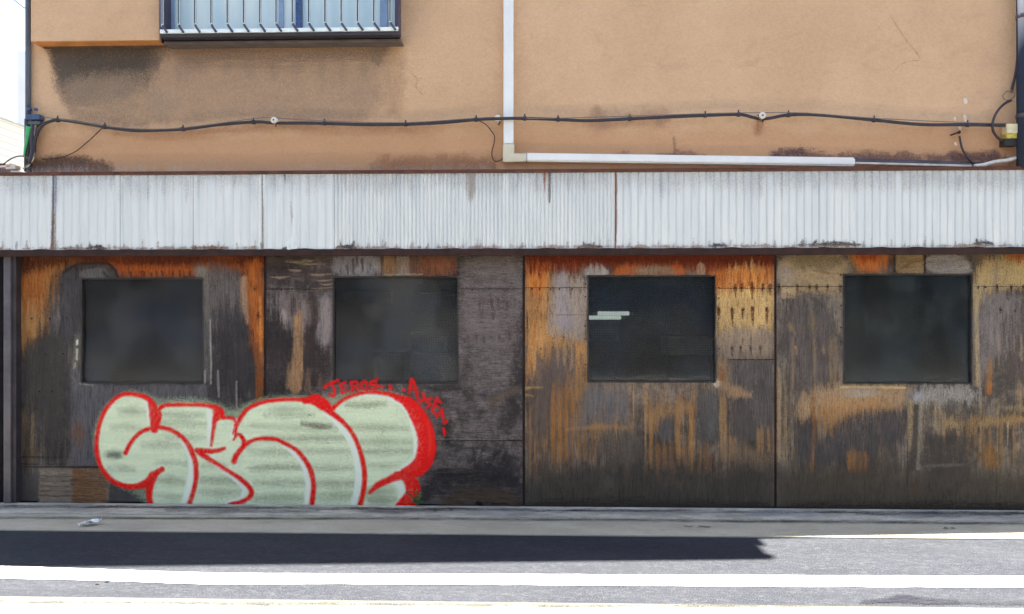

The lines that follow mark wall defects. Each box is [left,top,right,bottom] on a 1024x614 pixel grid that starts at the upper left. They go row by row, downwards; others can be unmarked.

corrosion [0,171,264,402]
corrosion [334,172,1024,479]
water stain [769,144,1010,202]